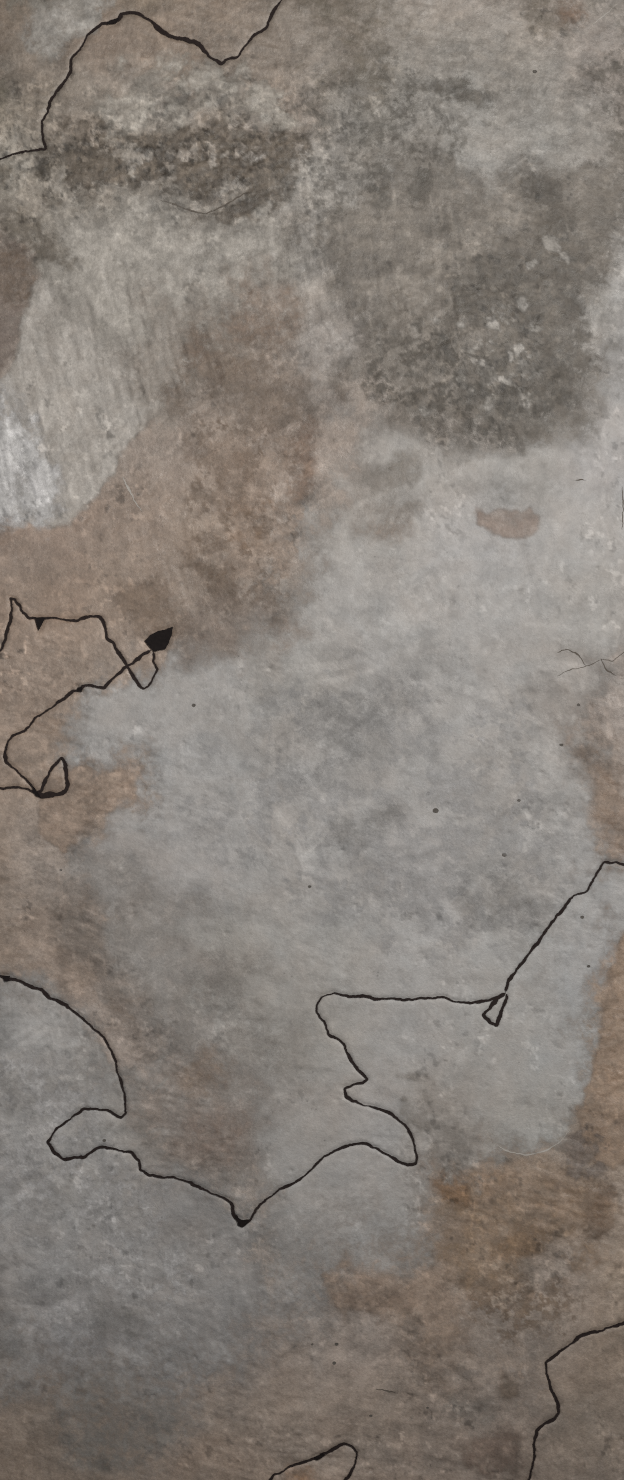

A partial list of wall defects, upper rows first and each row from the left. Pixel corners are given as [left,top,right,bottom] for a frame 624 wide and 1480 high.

crack [0,0,282,160]
leakage [36,0,388,224]
crack [161,191,256,214]
leakage [288,61,624,455]
leakage [165,282,312,431]
crack [0,597,173,799]
crack [557,649,624,676]
crack [0,861,624,1228]
crack [269,1442,358,1480]
crack [528,1321,624,1480]